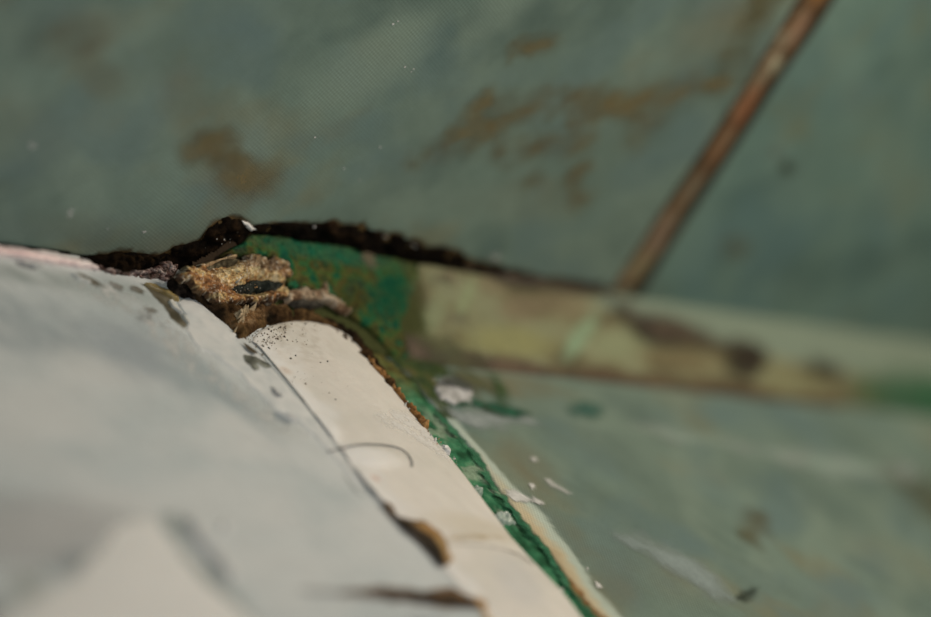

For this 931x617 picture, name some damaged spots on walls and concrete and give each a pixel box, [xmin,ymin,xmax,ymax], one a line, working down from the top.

crack [244,342,320,420]
spalling [79,216,602,483]
crack [306,444,489,617]